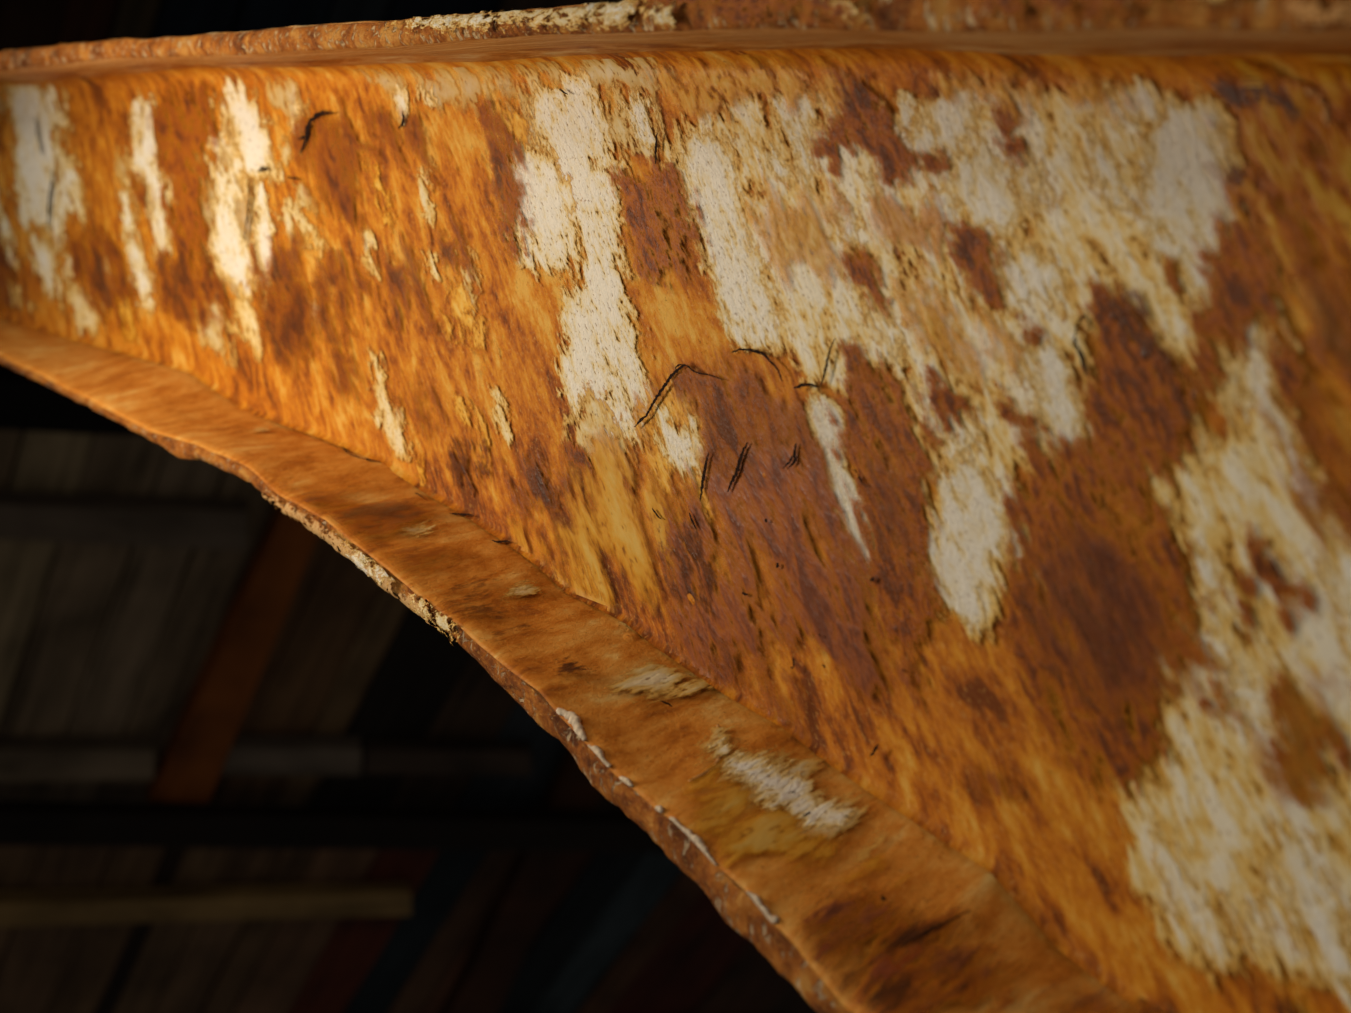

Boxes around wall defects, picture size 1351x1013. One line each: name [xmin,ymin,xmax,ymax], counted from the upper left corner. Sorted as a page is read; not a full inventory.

rust [57,224,137,330]
peeling [0,75,331,369]
rust [129,80,227,336]
rust [249,97,437,401]
peeling [391,0,678,36]
rust [608,154,708,289]
rust [646,53,954,190]
peeling [820,0,869,27]
peeling [1278,0,1351,25]
rust [388,337,979,703]
peeling [356,57,1351,1013]
rust [994,59,1351,810]